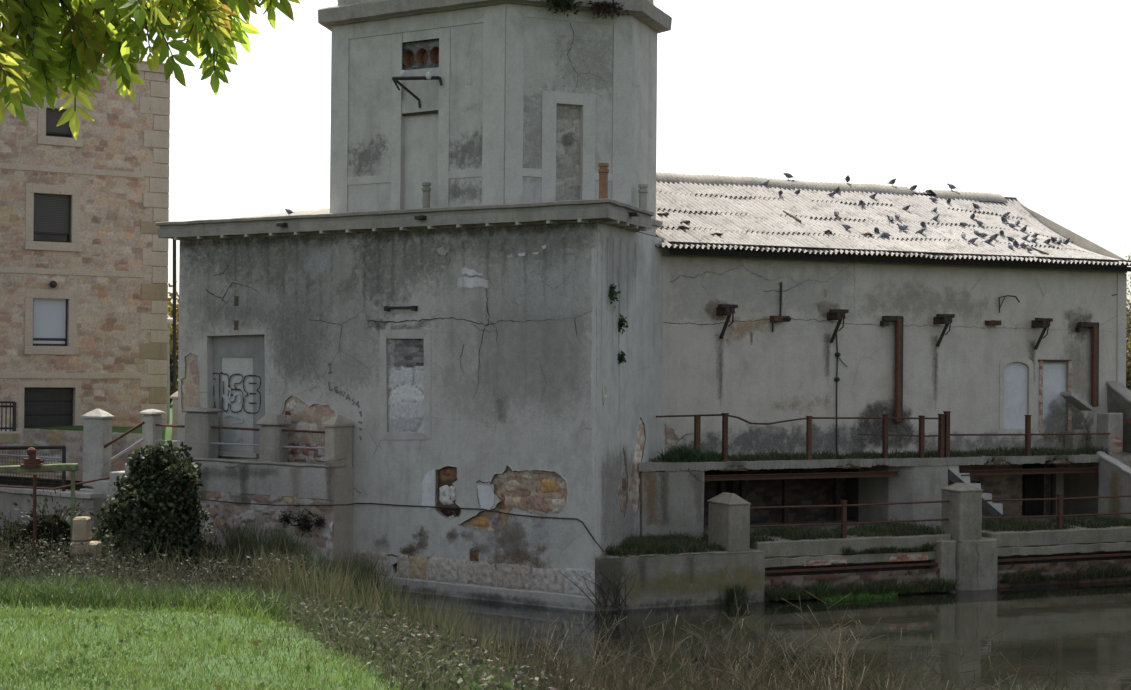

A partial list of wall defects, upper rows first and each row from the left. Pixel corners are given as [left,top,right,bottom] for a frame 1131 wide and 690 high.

crack [206,252,259,303]
crack [309,288,587,398]
flaking render [281,395,337,445]
flaking render [422,464,569,563]
flaking render [616,416,646,520]
water stain [700,403,935,457]